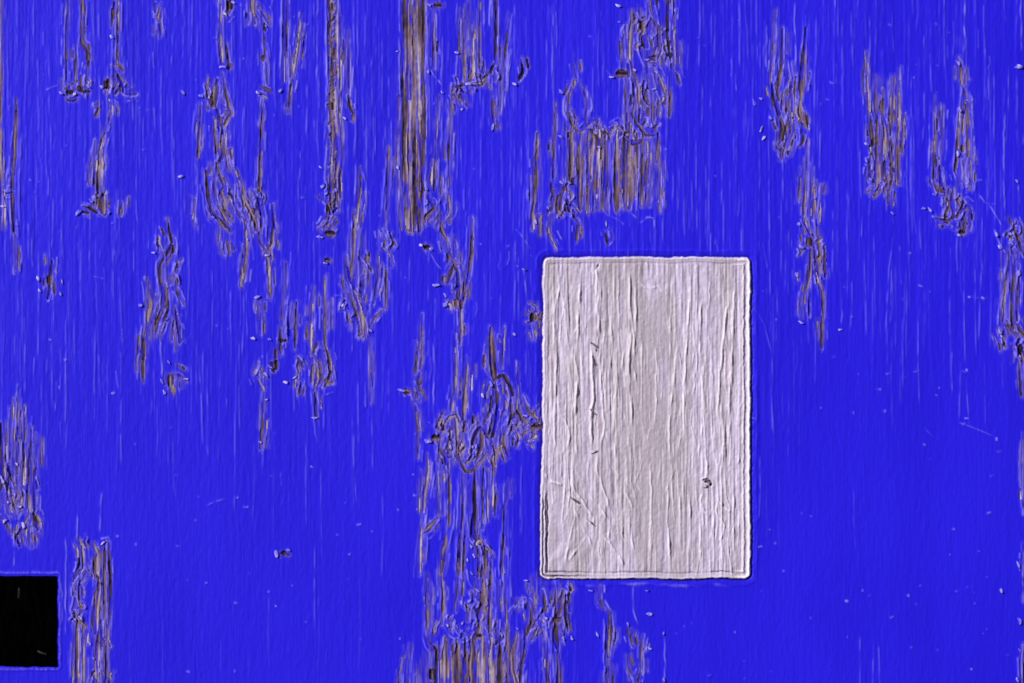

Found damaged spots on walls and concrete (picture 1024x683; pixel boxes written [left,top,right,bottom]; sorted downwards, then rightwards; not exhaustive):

peeling [59,0,137,216]
peeling [195,0,334,420]
peeling [532,0,680,249]
peeling [753,28,810,160]
peeling [863,51,906,215]
peeling [921,61,977,237]
peeling [341,0,574,683]
peeling [994,218,1024,396]
peeling [0,399,43,546]
peeling [70,538,112,683]